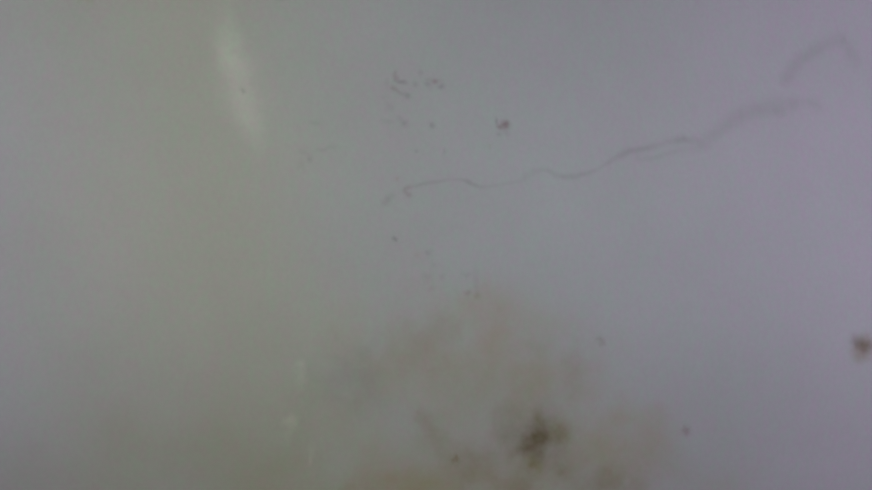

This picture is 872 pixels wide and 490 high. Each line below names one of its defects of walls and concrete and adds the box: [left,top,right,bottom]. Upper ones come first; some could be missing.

damp [225,239,845,490]